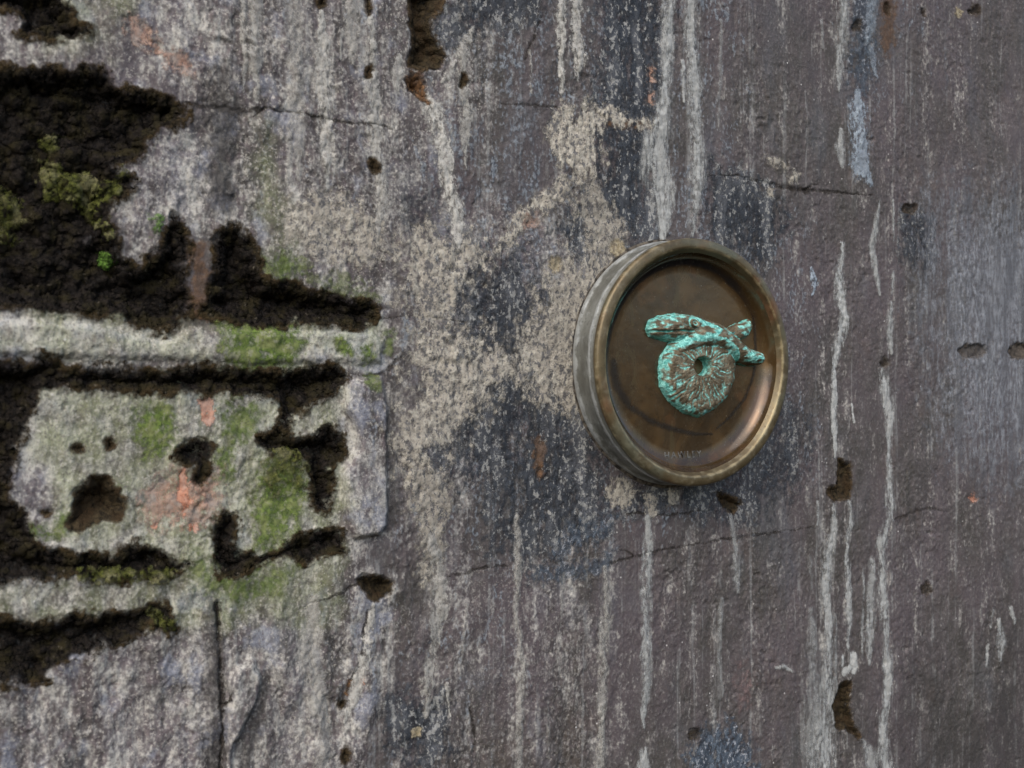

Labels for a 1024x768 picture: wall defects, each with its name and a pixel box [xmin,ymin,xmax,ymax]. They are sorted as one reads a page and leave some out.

crack [184,101,390,129]
crack [707,174,872,196]
damp [418,0,816,728]
efflorescence [830,242,849,458]
hole [957,344,985,359]
hole [827,457,853,502]
hole [357,574,394,602]
crack [610,526,812,564]
efflorescence [811,368,896,768]
damp [381,534,459,768]
crack [213,599,232,768]
hole [832,680,862,741]